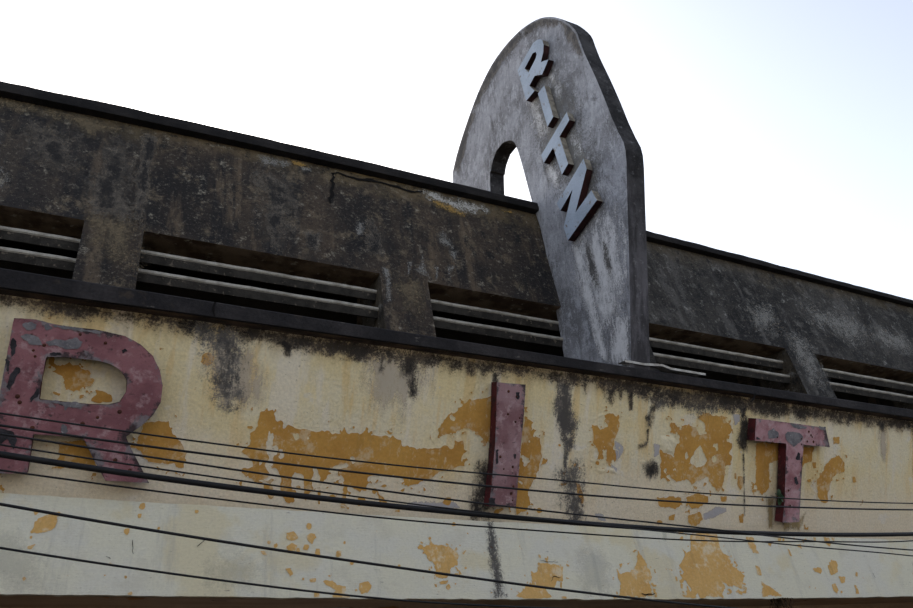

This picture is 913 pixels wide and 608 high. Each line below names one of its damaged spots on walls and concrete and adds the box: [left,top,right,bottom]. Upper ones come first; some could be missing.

crack [328,172,423,203]
leakage [453,18,581,173]
leakage [526,69,607,198]
leakage [568,203,629,366]
peeling [286,568,372,597]
peeling [235,388,499,510]
peeling [417,537,467,590]
leakage [0,294,913,512]
leakage [407,460,507,598]
peeling [511,555,569,599]
peeling [613,542,657,599]
peeling [656,408,859,598]